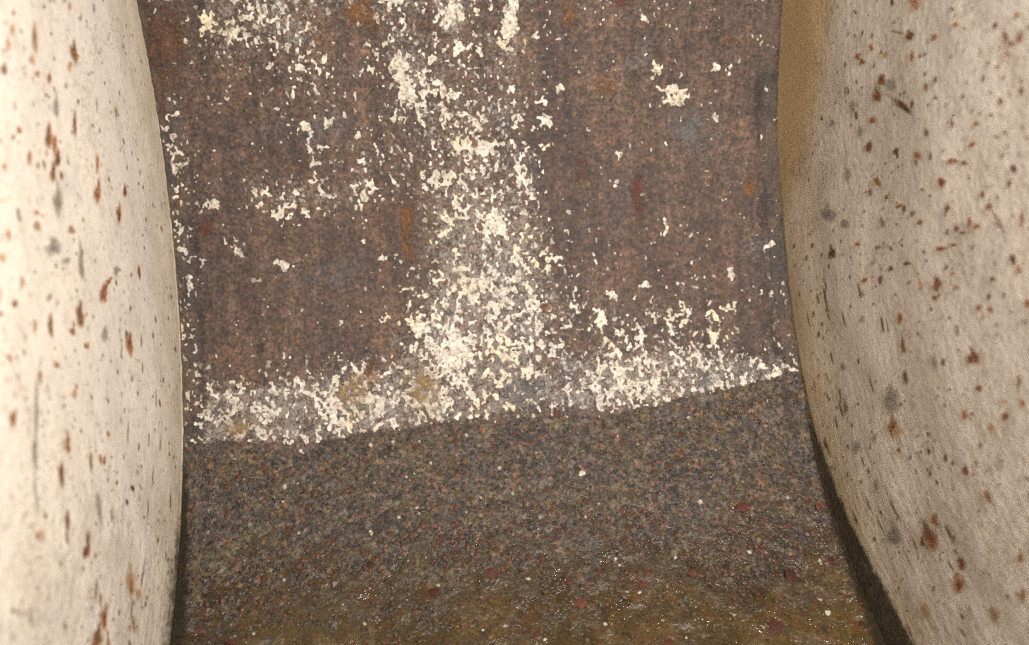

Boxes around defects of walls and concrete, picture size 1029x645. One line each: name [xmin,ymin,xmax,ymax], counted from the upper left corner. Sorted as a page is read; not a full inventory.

rust [2,11,55,99]
rust [68,38,79,73]
rust [835,23,928,137]
rust [0,119,69,186]
rust [94,154,111,203]
rust [7,278,94,372]
rust [100,266,141,303]
rust [97,316,176,375]
rust [26,418,83,488]
rust [882,370,977,486]
rust [81,522,150,645]
rust [880,503,989,593]